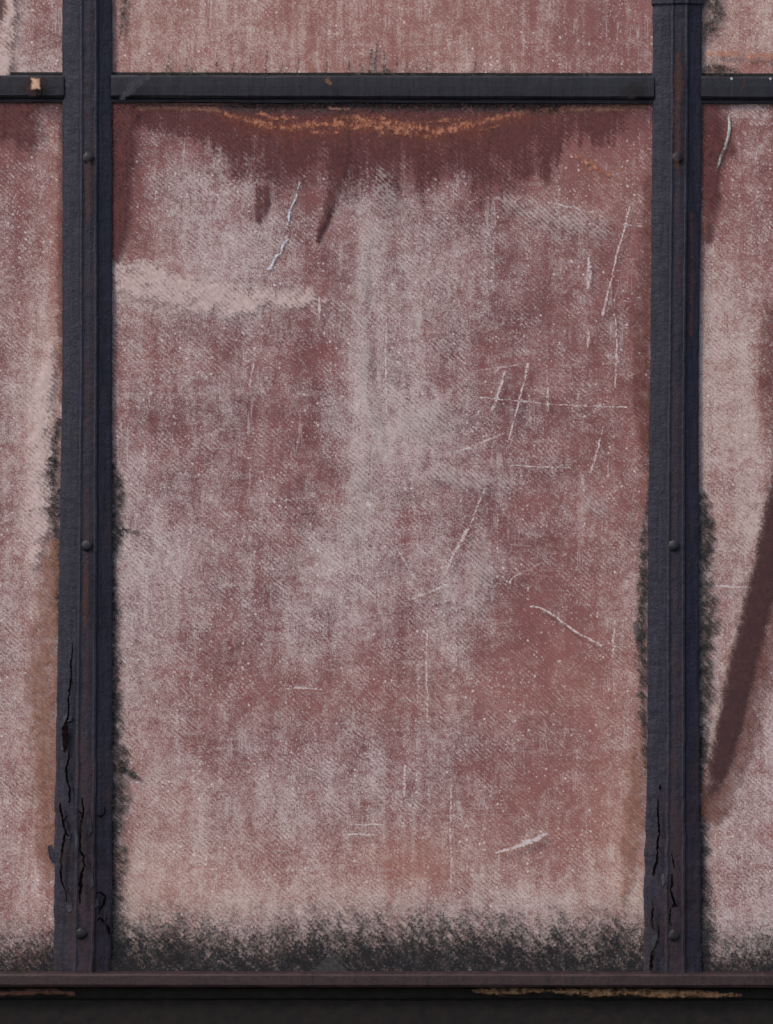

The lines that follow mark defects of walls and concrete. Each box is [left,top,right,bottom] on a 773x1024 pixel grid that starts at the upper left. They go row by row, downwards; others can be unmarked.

corrosion [112,103,647,263]
crack [65,644,73,721]
water stain [109,463,644,972]
water stain [633,492,649,775]
water stain [699,491,773,971]
crack [59,753,110,934]
crack [649,784,678,971]